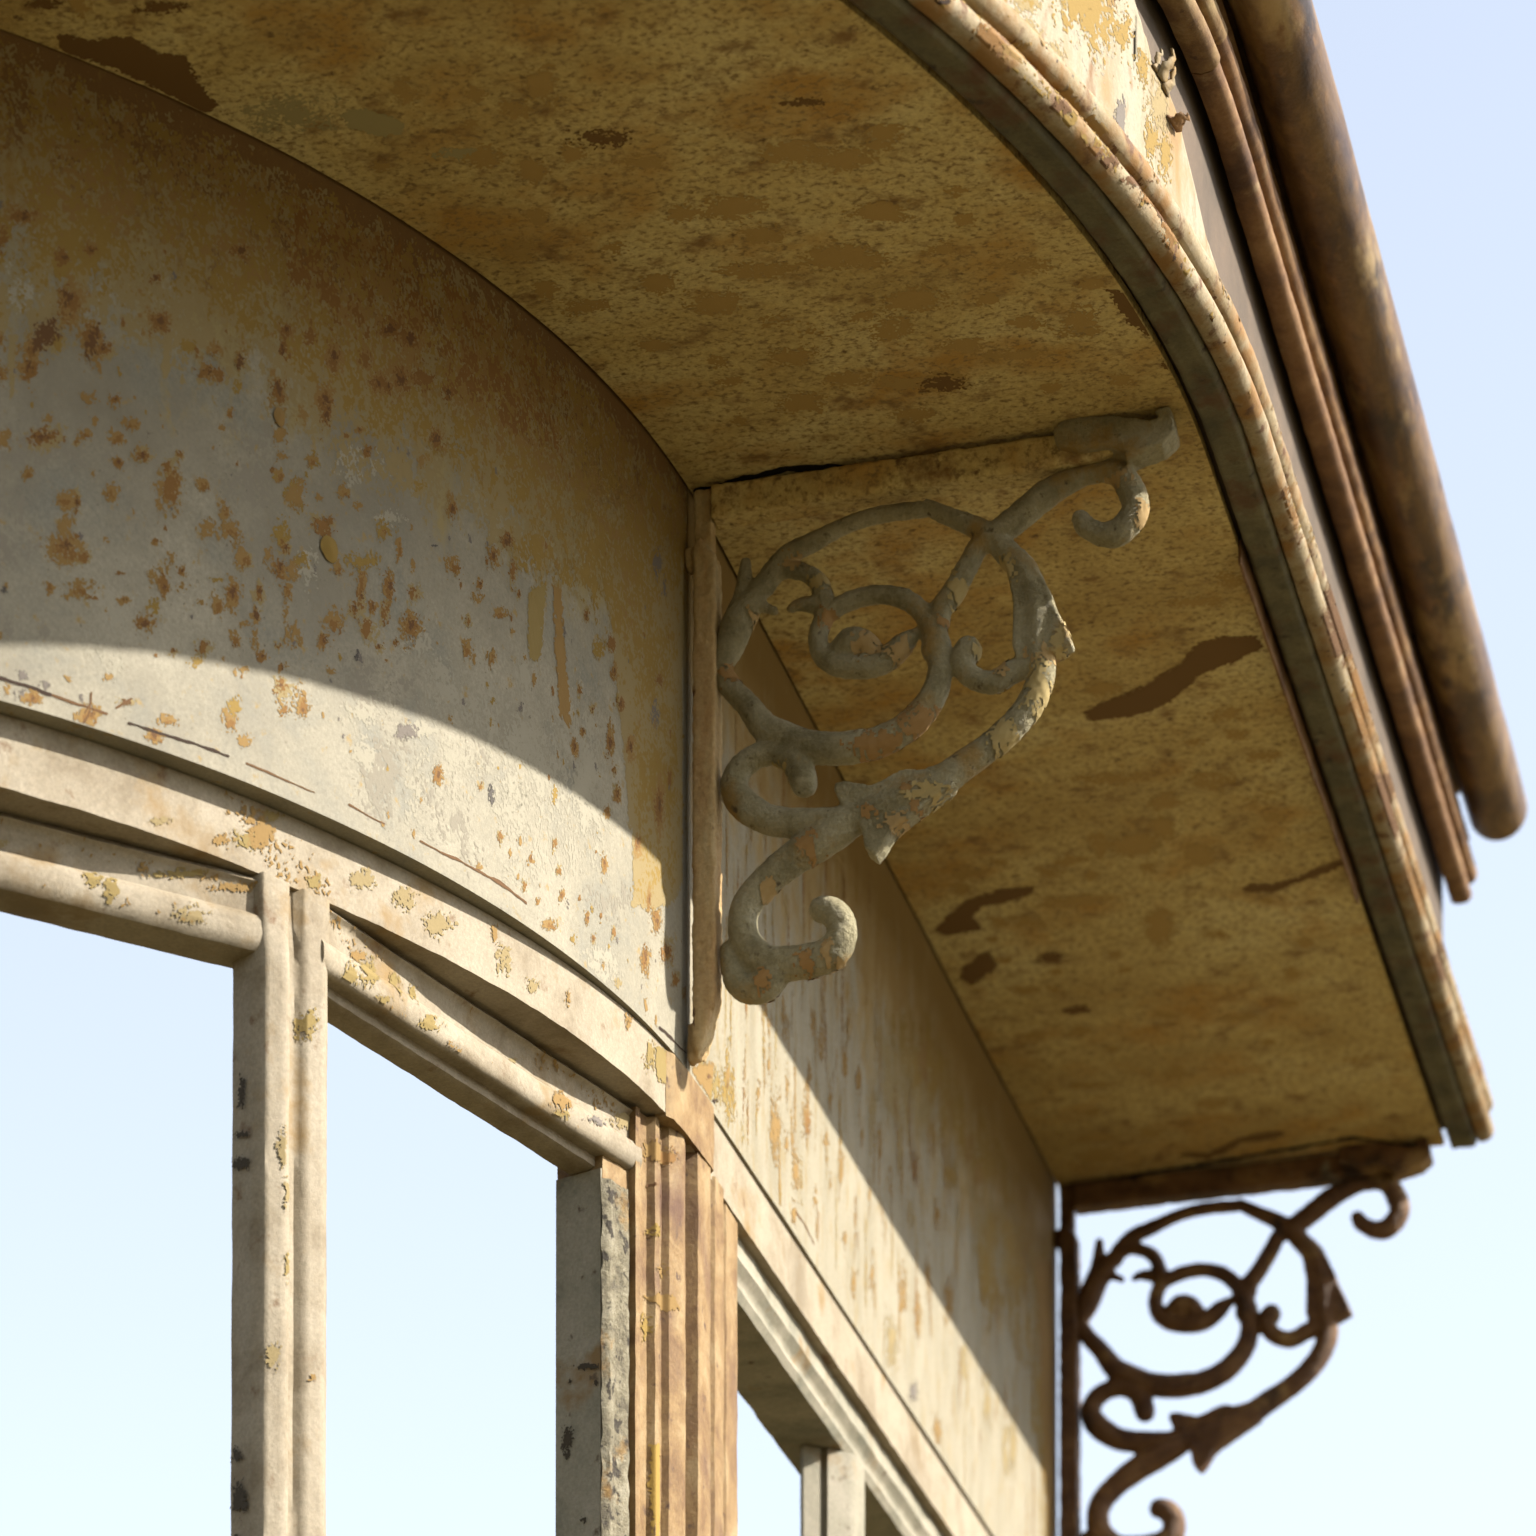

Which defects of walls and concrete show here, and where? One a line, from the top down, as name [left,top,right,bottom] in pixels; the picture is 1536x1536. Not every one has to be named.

peeling [1075,4,1125,77]
water stain [0,35,687,911]
corrosion [1134,497,1150,532]
corrosion [850,629,917,673]
corrosion [1083,635,1264,722]
peeling [337,613,632,986]
corrosion [935,886,1073,986]